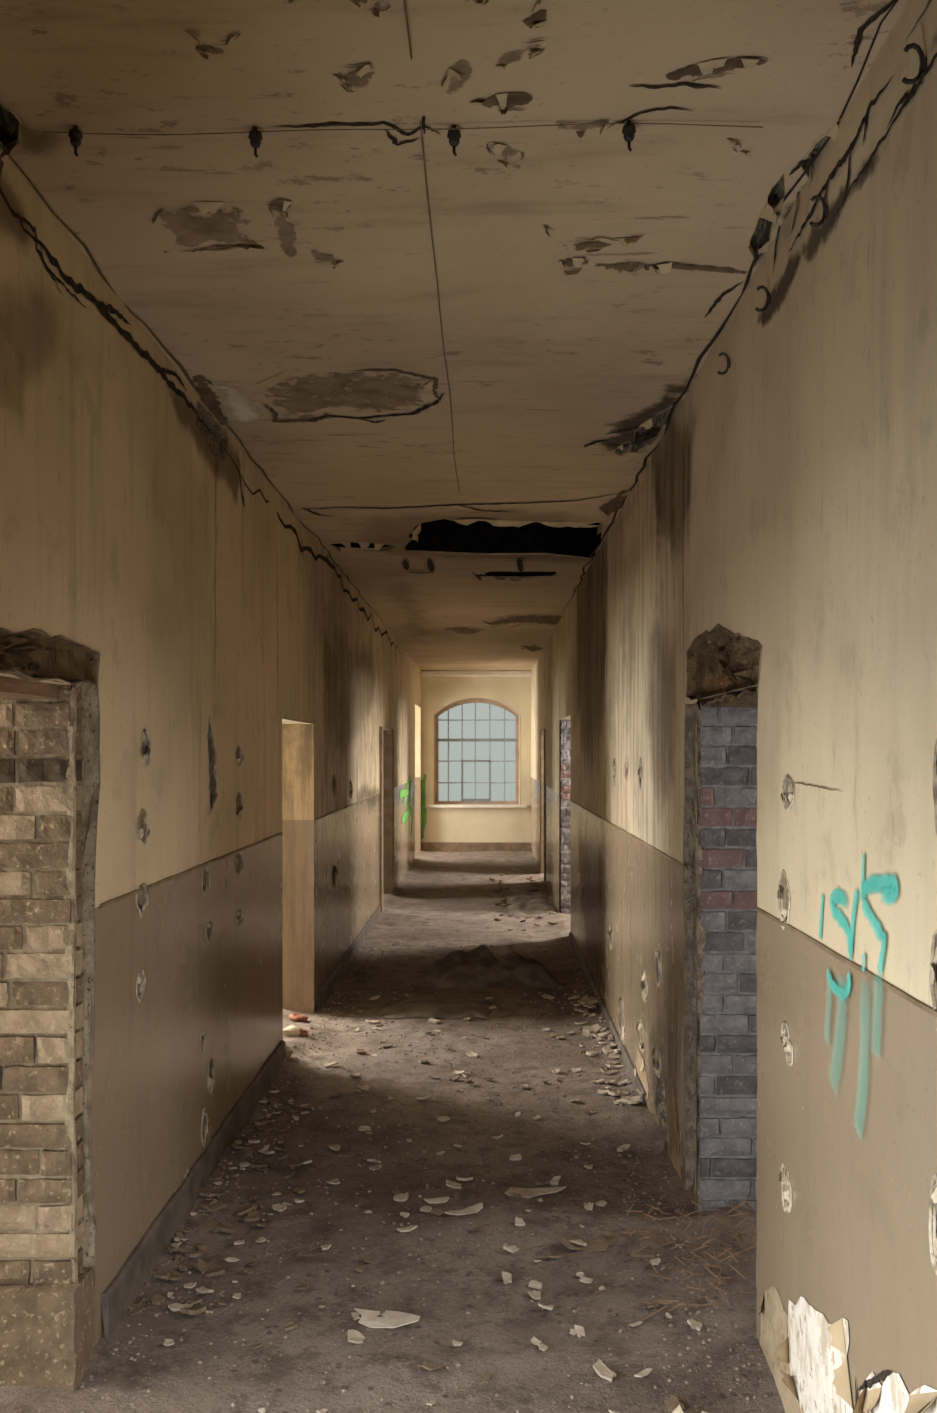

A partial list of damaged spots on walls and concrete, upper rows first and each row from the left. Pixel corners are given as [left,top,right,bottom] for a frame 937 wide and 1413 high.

peeling [152,199,343,269]
peeling [254,370,441,423]
crack [0,0,937,654]
flaking render [0,628,100,1288]
flaking render [618,949,667,1142]
flaking render [683,623,762,1214]
flaking render [929,930,937,1030]
peeling [759,1286,937,1413]